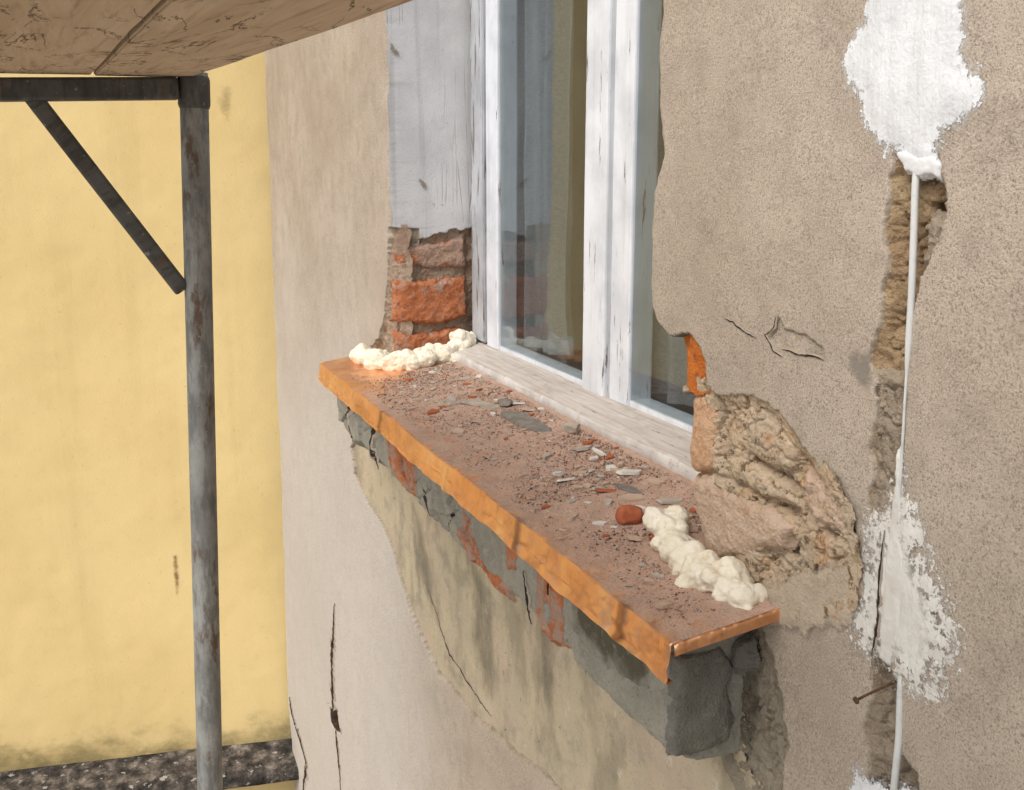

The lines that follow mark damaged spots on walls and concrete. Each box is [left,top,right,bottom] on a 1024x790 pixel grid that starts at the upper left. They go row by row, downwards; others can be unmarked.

flaking render [372,225,473,353]
crack [724,313,825,360]
crack [289,697,309,790]
crack [328,603,342,790]
crack [426,583,492,716]
spalling [684,334,864,790]
crack [871,530,886,657]